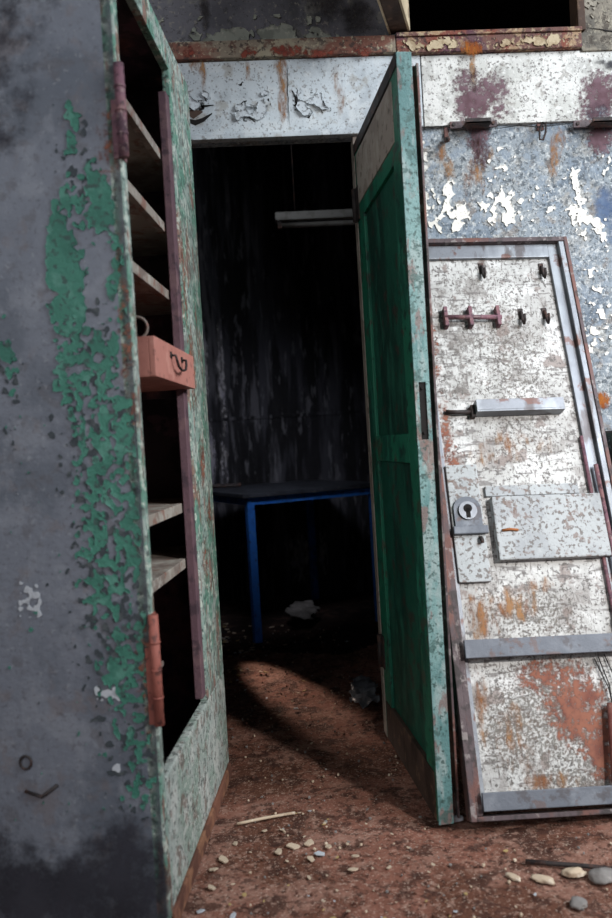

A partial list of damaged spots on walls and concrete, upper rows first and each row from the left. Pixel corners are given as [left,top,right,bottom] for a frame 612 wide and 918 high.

rust [270,45,334,116]
rust [453,41,510,181]
rust [575,69,612,155]
peeling [425,146,609,253]
peeling [583,267,612,353]
rust [598,392,609,409]